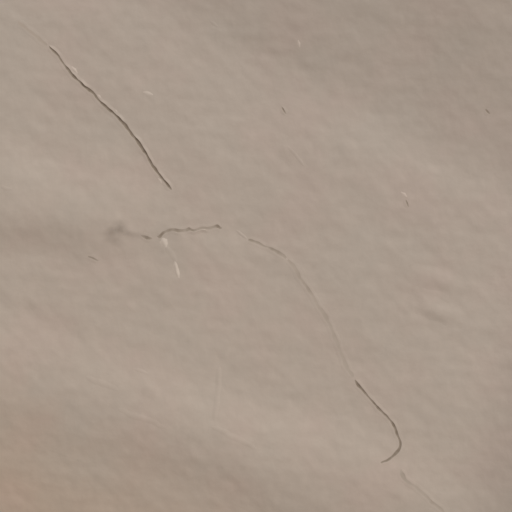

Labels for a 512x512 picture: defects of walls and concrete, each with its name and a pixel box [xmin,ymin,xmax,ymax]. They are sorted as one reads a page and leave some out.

crack [17,20,174,191]
crack [140,221,222,278]
crack [236,230,405,466]